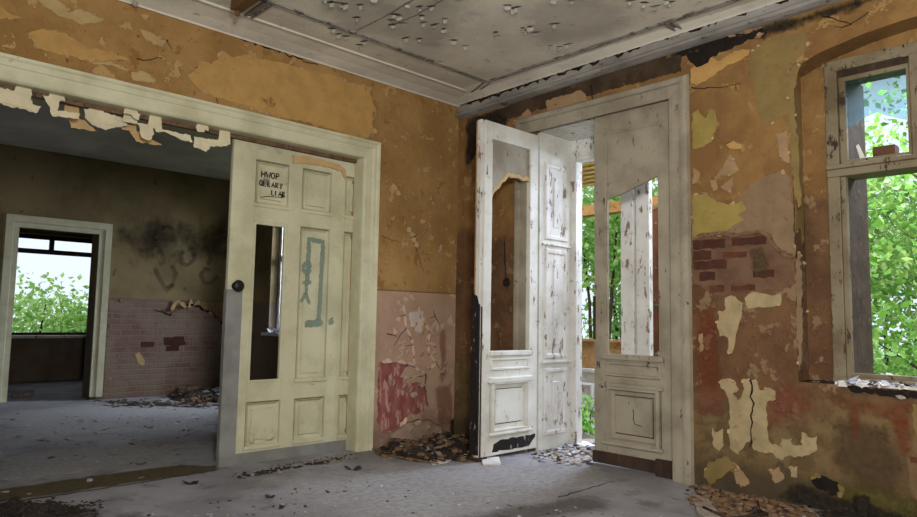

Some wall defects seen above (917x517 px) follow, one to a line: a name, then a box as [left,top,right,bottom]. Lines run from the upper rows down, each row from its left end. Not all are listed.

peeling [39,0,105,25]
peeling [28,29,156,84]
peeling [132,0,166,47]
peeling [322,0,378,22]
peeling [386,0,468,50]
peeling [0,86,231,152]
peeling [188,50,377,139]
flaking render [103,298,223,399]
peeling [377,358,429,433]
crack [748,379,756,447]
flaking render [810,473,844,498]
leakage [786,424,902,517]